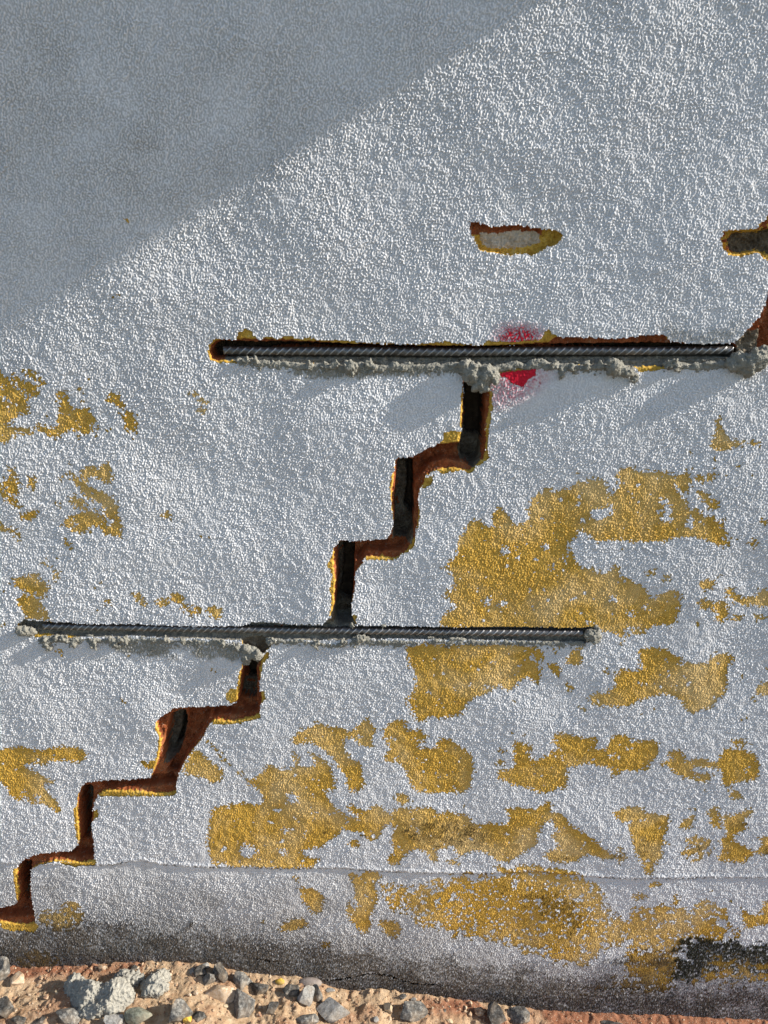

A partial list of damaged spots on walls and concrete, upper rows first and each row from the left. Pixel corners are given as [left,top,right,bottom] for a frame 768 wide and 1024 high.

spalling [469,221,563,256]
spalling [207,328,734,374]
peeling [0,369,139,445]
crack [327,381,493,622]
peeling [0,415,768,994]
crack [0,635,271,933]
water stain [0,919,768,1021]